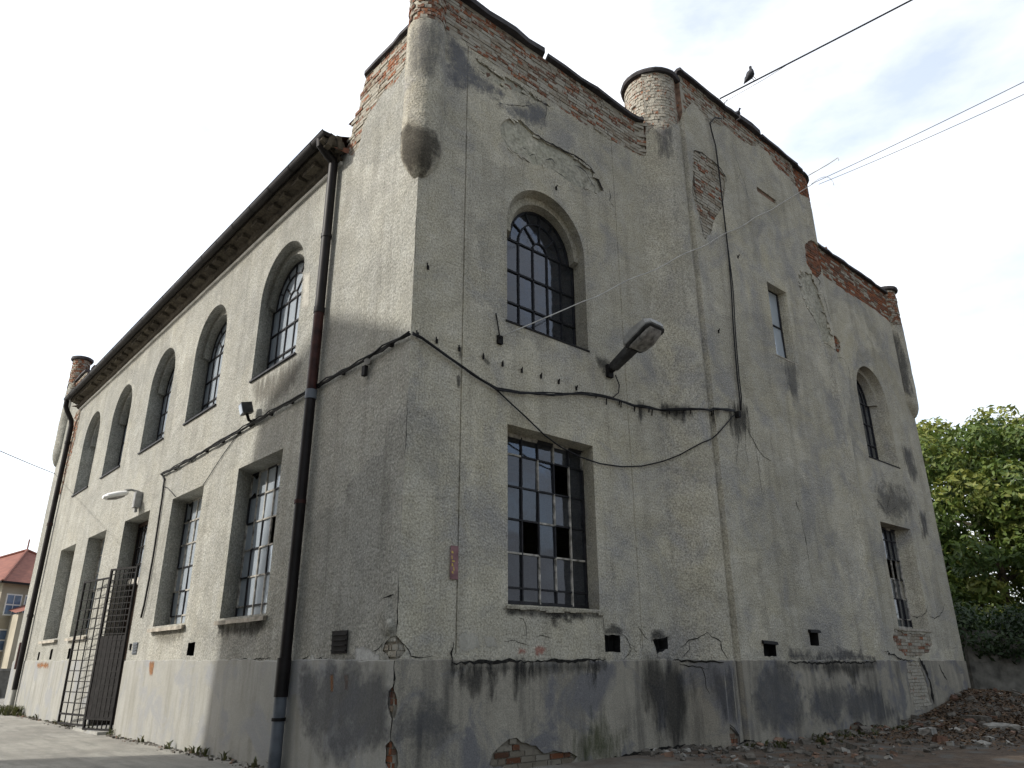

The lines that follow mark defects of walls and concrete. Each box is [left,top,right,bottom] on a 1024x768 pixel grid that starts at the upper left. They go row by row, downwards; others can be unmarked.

damp [447,40,503,95]
flaking render [445,0,678,159]
damp [401,124,441,177]
peeling [501,117,603,195]
flaking render [692,150,726,240]
flaking render [798,240,890,353]
crack [374,582,647,692]
damp [645,661,686,747]
crack [675,632,728,694]
damp [756,650,899,728]
crack [788,651,947,702]
flaking render [893,629,933,710]